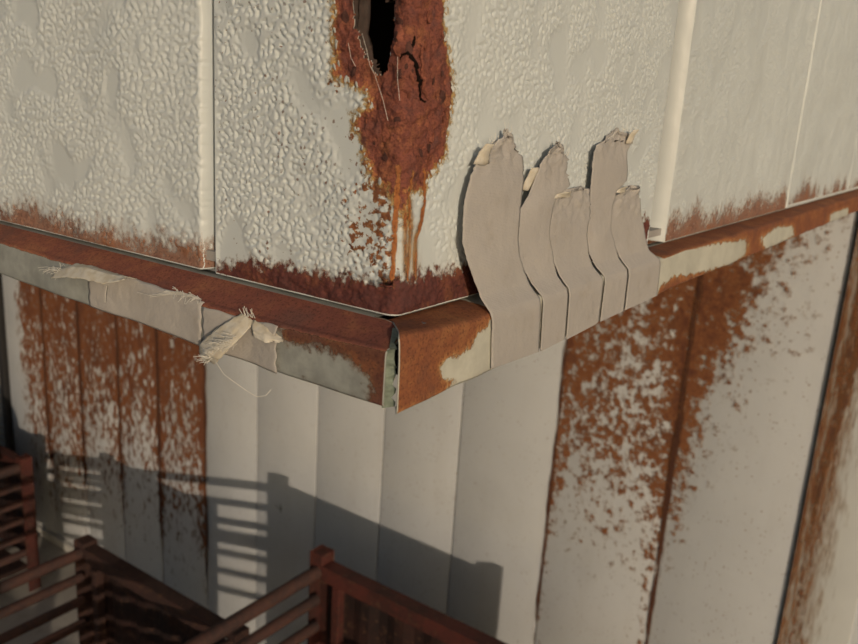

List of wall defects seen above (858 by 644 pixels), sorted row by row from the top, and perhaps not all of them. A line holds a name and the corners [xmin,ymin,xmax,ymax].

peeling [51,263,137,285]
rust [14,281,208,576]
peeling [199,314,283,364]
rust [0,0,491,413]
rust [536,180,858,644]